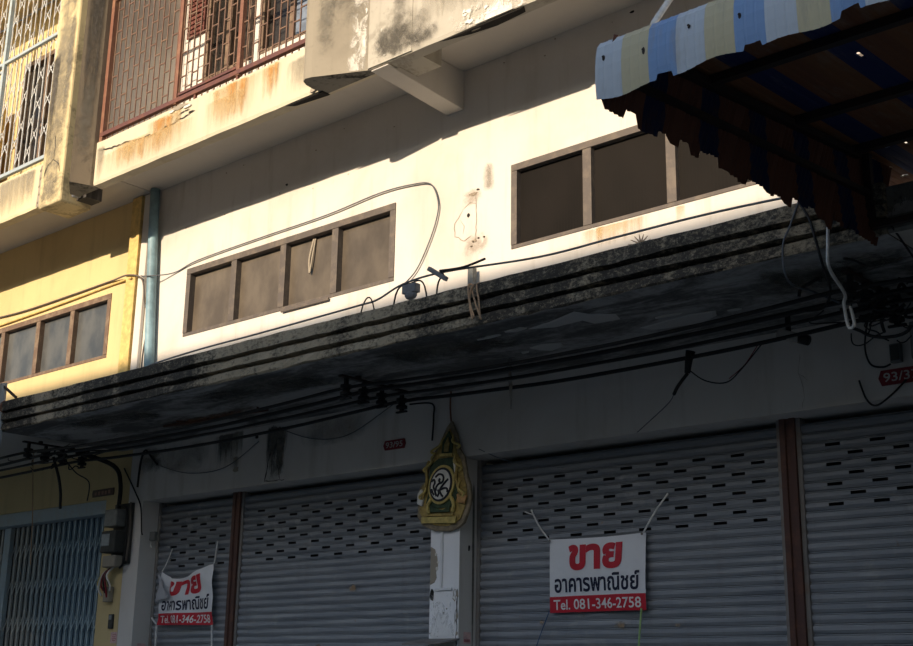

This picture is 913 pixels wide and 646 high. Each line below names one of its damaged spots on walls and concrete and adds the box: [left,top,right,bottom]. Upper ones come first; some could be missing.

peeling [348,0,368,71]
water stain [376,14,430,56]
peeling [439,0,526,42]